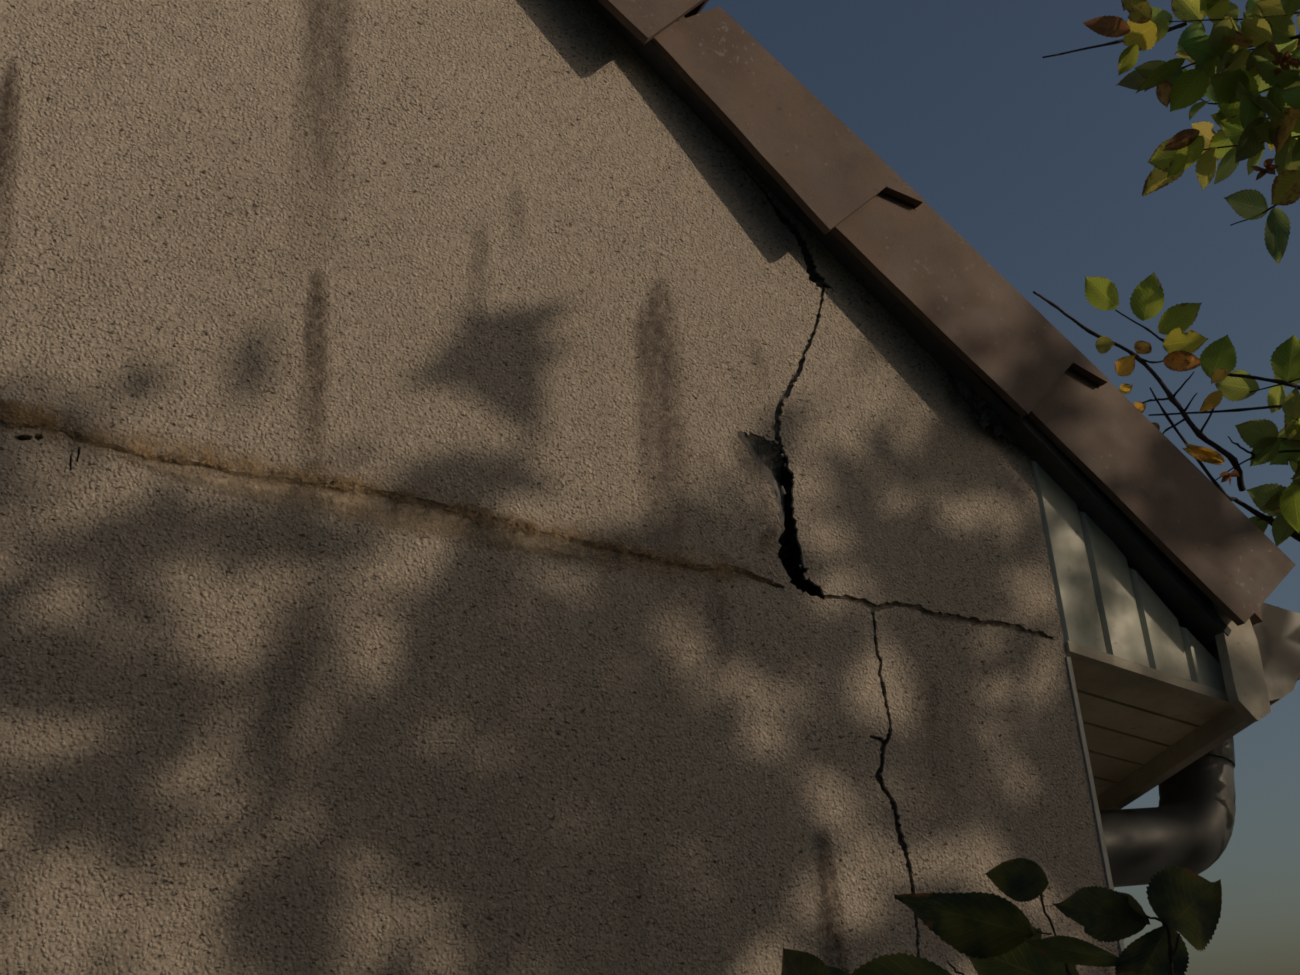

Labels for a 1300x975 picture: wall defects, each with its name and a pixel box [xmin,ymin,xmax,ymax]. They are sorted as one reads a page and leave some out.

crack [0,181,1052,957]